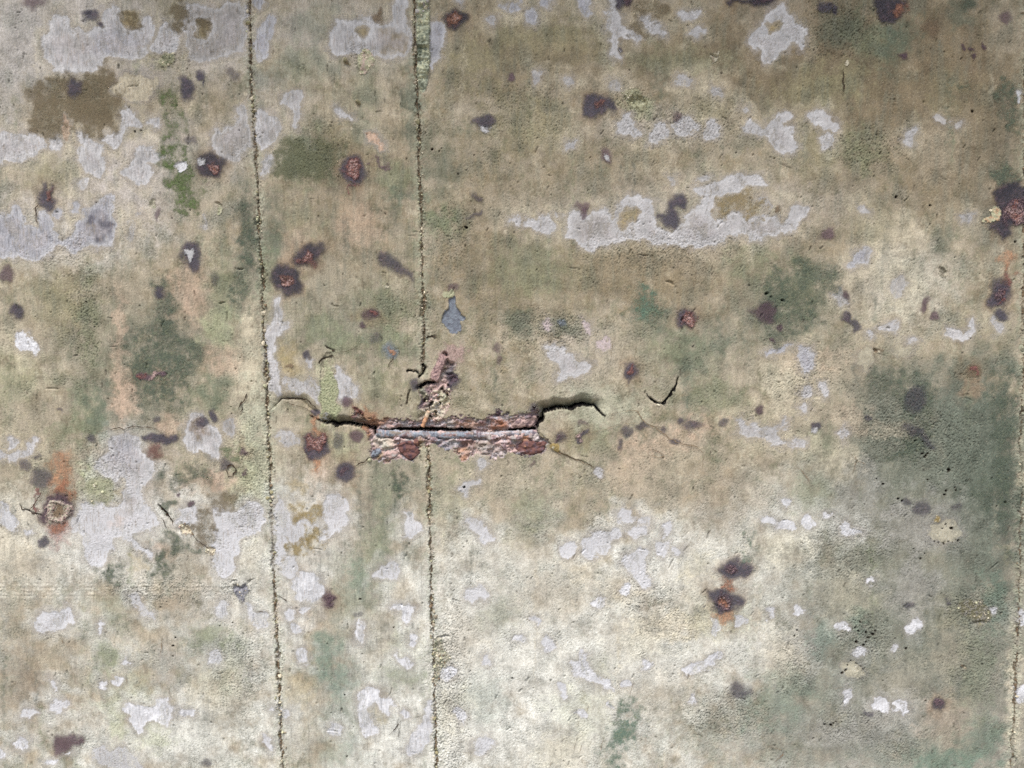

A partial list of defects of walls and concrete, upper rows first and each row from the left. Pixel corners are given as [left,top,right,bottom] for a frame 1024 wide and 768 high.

corrosion [444,10,469,30]
corrosion [197,153,225,177]
corrosion [340,155,390,193]
corrosion [990,182,1024,238]
corrosion [272,242,323,296]
corrosion [677,309,696,328]
corrosion [304,416,330,470]
crack [269,335,471,467]
spalling [261,289,560,499]
crack [508,376,717,470]
corrosion [33,452,73,542]
corrosion [703,557,753,624]